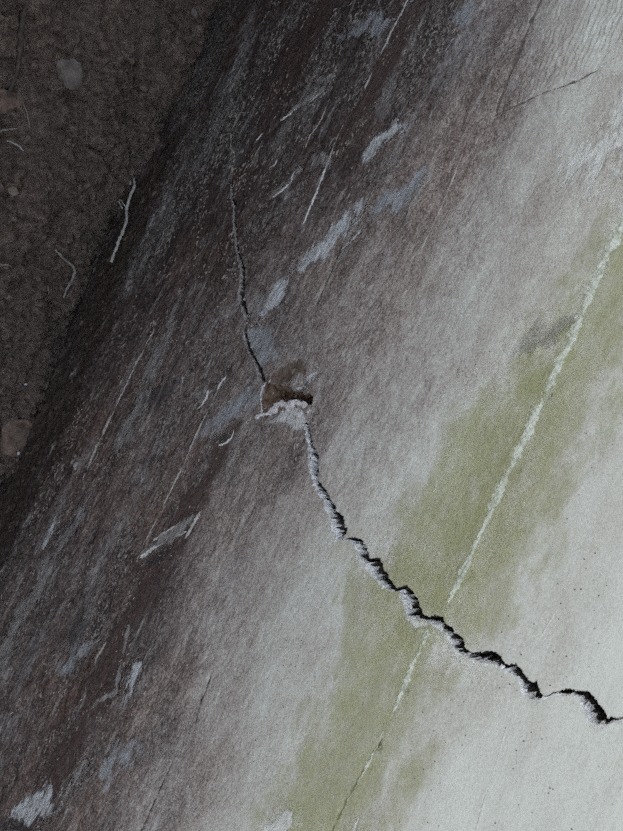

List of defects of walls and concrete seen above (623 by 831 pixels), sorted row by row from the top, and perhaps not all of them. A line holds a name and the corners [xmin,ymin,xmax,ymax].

crack [229,68,309,384]
spalling [255,359,317,431]
crack [303,424,623,730]